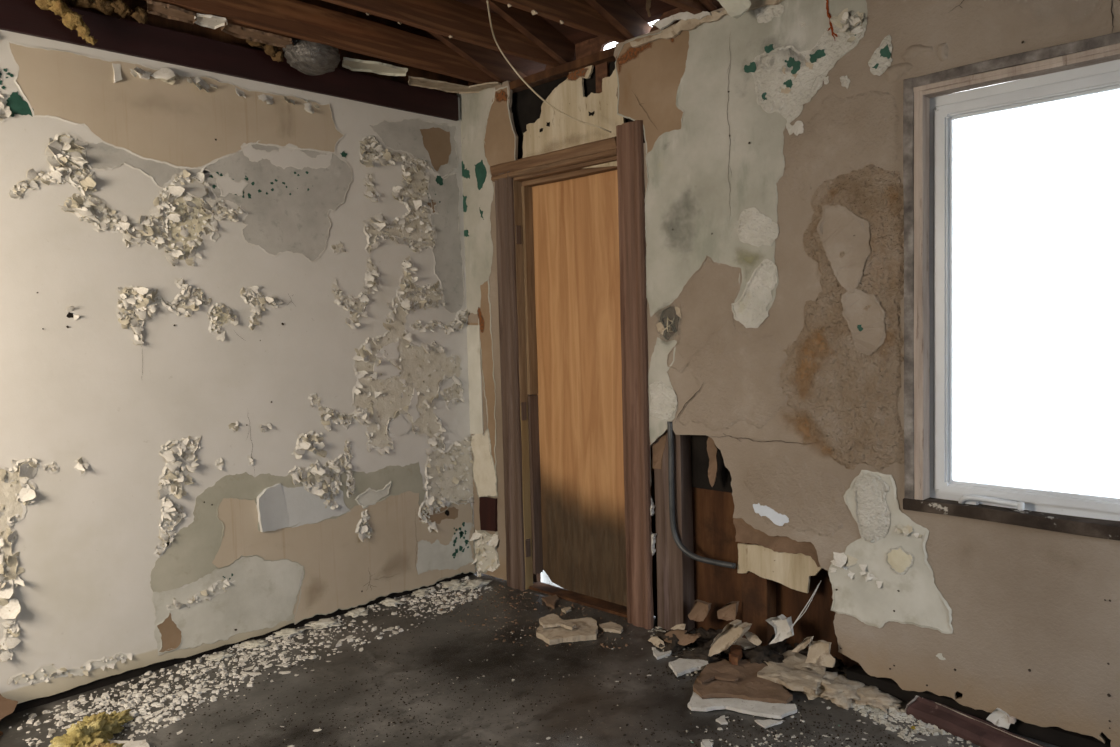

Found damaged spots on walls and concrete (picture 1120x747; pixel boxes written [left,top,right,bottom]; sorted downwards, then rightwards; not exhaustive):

peeling [830,8,867,43]
flaking render [667,255,742,373]
peeling [0,41,500,662]
hole [691,435,732,493]
peeling [830,552,883,589]
peeling [8,651,134,685]